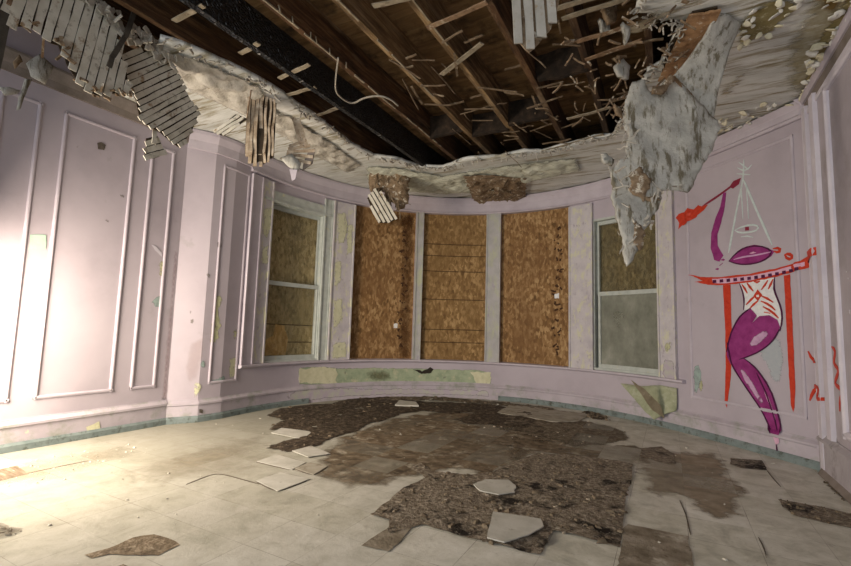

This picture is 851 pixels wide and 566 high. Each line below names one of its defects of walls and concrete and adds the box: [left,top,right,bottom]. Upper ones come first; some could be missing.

peeling [0,36,77,110]
flaking render [613,59,630,81]
spalling [620,0,687,83]
peeling [718,0,851,134]
spalling [155,37,625,204]
peeling [268,367,628,452]
peeling [620,380,677,420]
peeling [0,466,28,480]
peeling [86,534,180,566]
peeling [361,453,694,566]
peeling [641,446,676,465]
peeling [778,499,851,528]